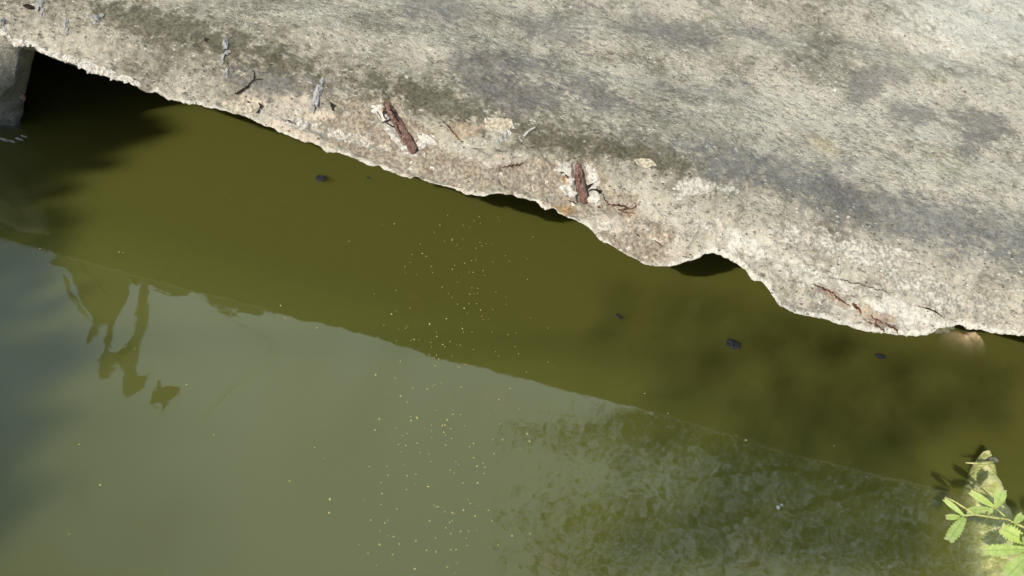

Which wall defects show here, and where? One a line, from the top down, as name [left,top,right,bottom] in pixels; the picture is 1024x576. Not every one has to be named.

spalling [0,27,134,85]
spalling [222,95,263,114]
spalling [274,93,741,266]